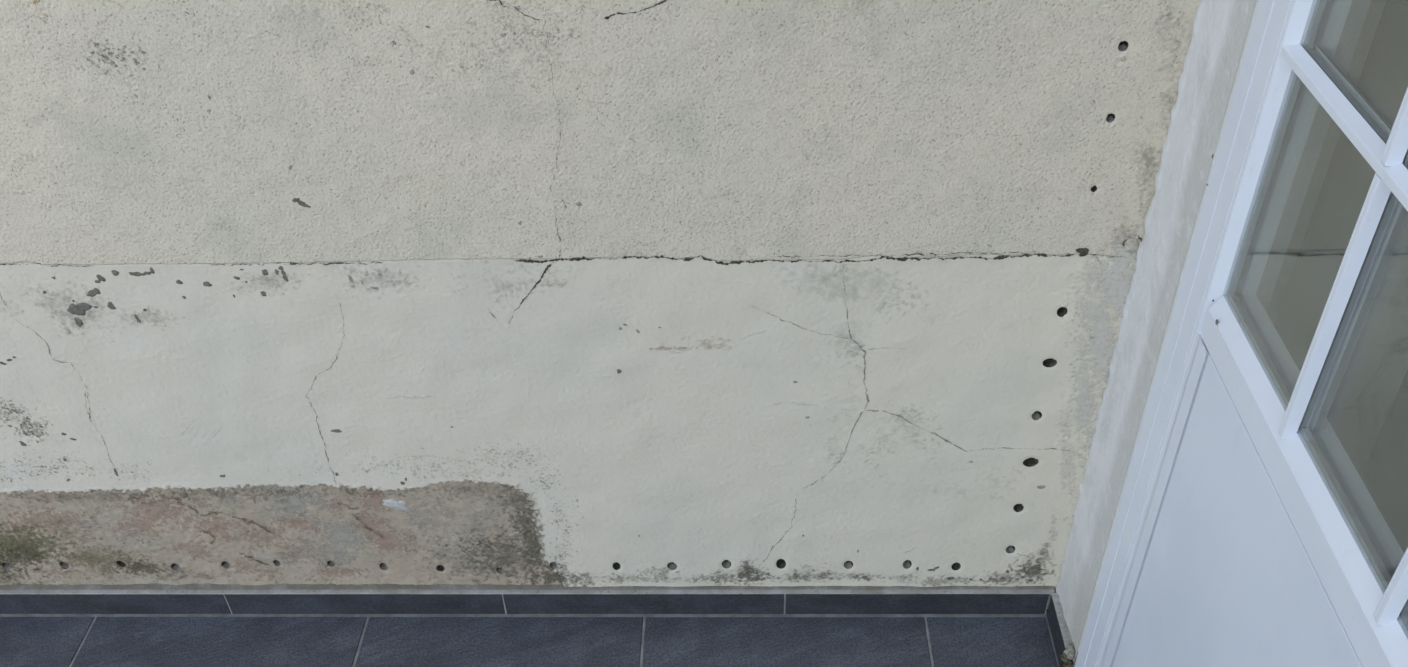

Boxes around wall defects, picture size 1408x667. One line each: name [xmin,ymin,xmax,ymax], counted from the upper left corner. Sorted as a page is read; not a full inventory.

crack [216,260,381,268]
crack [490,0,1126,572]
flaking render [0,468,563,585]